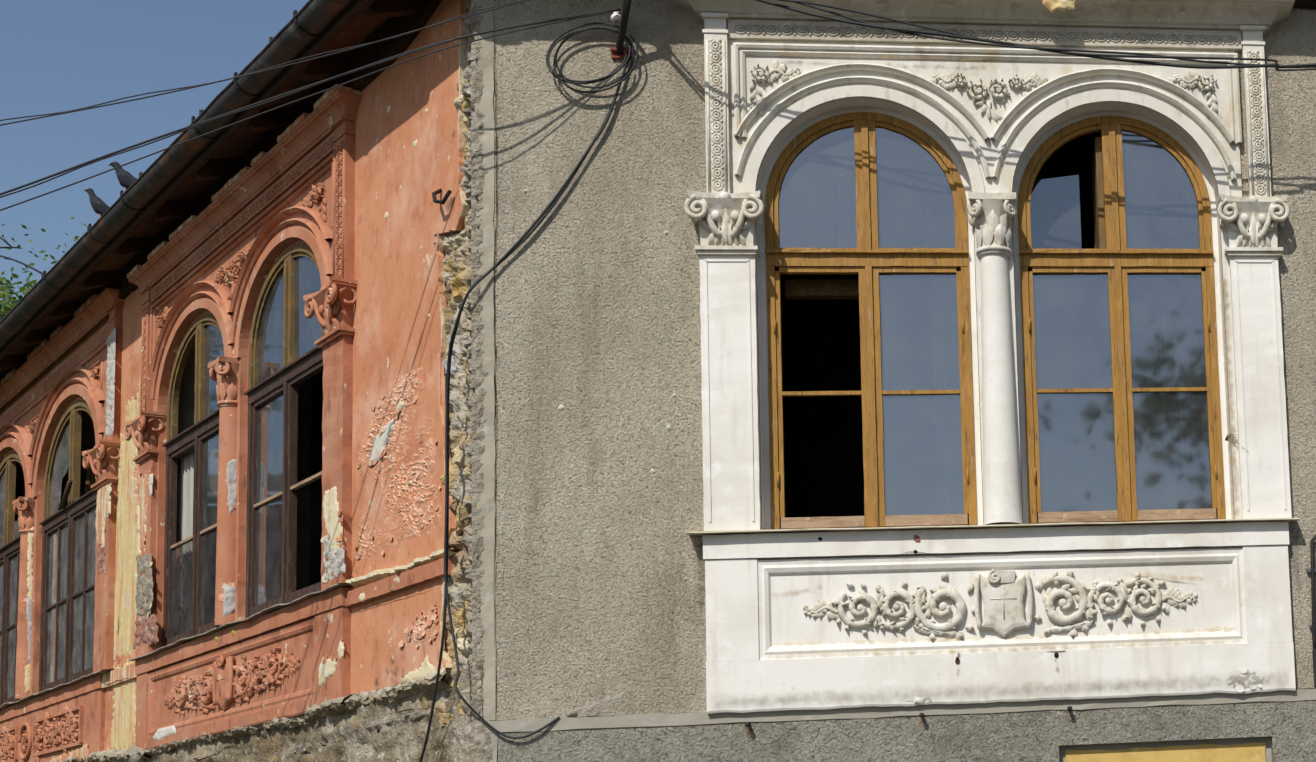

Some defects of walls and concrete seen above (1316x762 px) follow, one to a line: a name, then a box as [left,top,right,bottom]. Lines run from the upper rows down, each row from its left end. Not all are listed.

peeling [22,526,34,692]
flaking render [47,0,493,762]